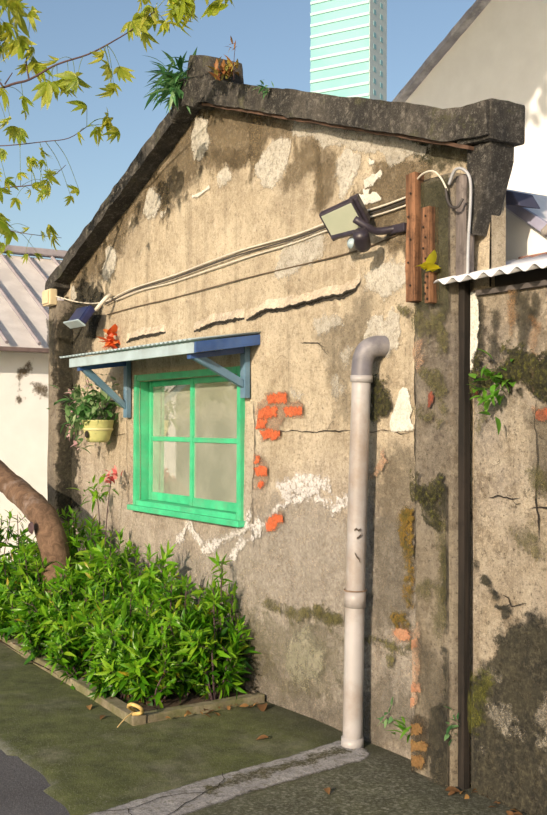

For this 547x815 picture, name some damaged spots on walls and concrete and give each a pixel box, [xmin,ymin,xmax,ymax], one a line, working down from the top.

flaking render [143,189,166,220]
flaking render [191,114,210,161]
flaking render [254,138,291,189]
damp [46,108,337,544]
spalling [194,281,361,332]
flaking render [255,389,303,442]
crack [245,309,416,547]
crack [490,406,547,533]
damp [134,473,348,721]
damp [363,484,448,788]
damp [471,560,547,815]
crack [106,772,225,815]